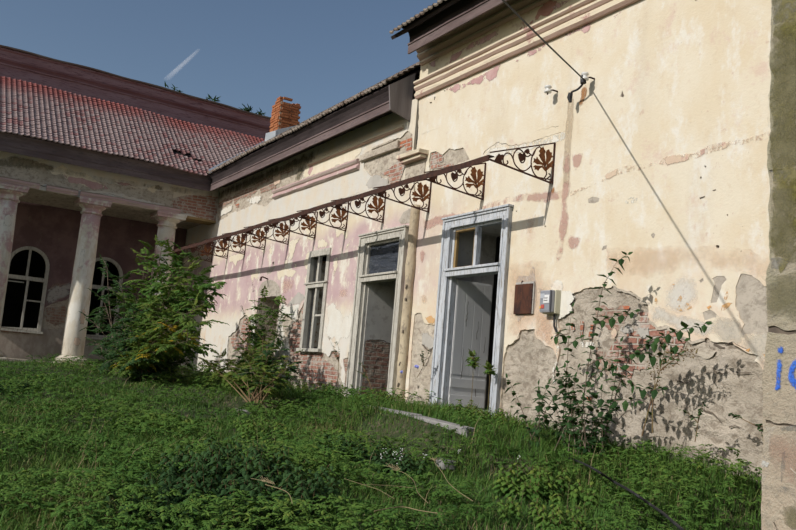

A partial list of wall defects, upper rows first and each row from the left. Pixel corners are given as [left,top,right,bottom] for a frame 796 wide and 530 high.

peeling [519,0,569,30]
peeling [446,65,500,93]
spalling [0,161,174,207]
spalling [217,131,413,222]
spalling [430,148,470,171]
spalling [227,315,251,375]
spalling [281,303,352,395]
flaking render [361,341,391,398]
spalling [402,313,435,404]
spalling [501,274,768,483]